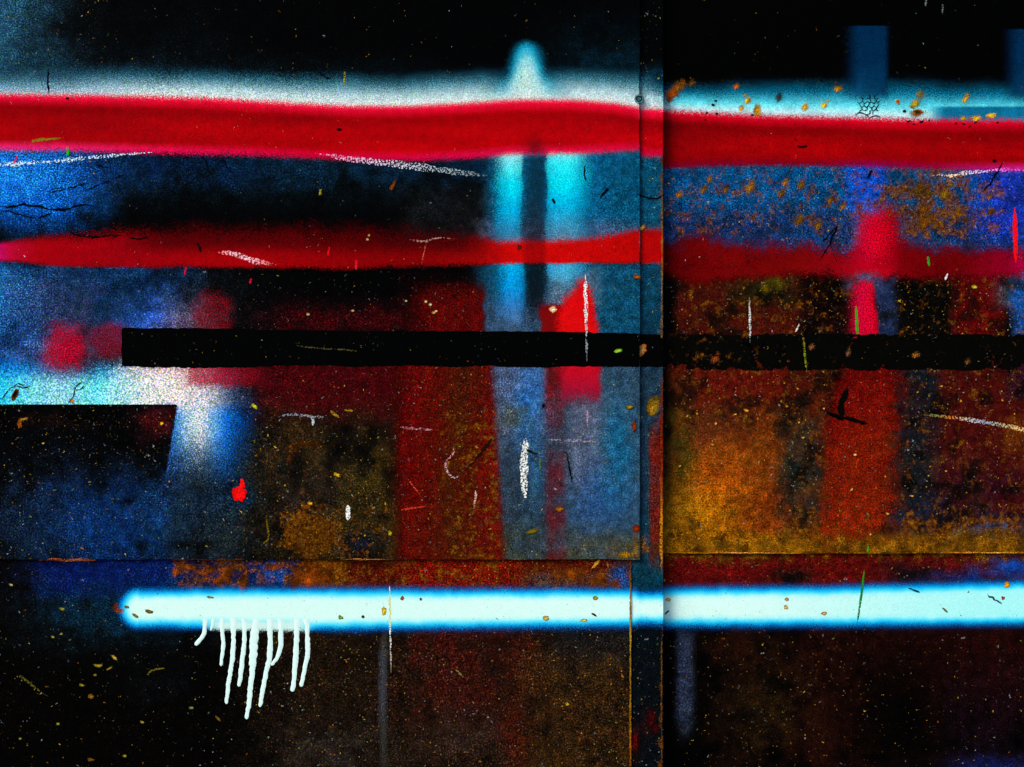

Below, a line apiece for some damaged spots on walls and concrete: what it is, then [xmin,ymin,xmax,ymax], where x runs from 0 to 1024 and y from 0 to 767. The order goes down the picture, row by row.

crack [856,95,880,118]
crack [0,164,148,240]
corrosion [699,175,729,194]
corrosion [777,178,805,197]
corrosion [907,181,954,231]
corrosion [794,214,824,230]
corrosion [171,559,250,590]
corrosion [266,558,392,588]